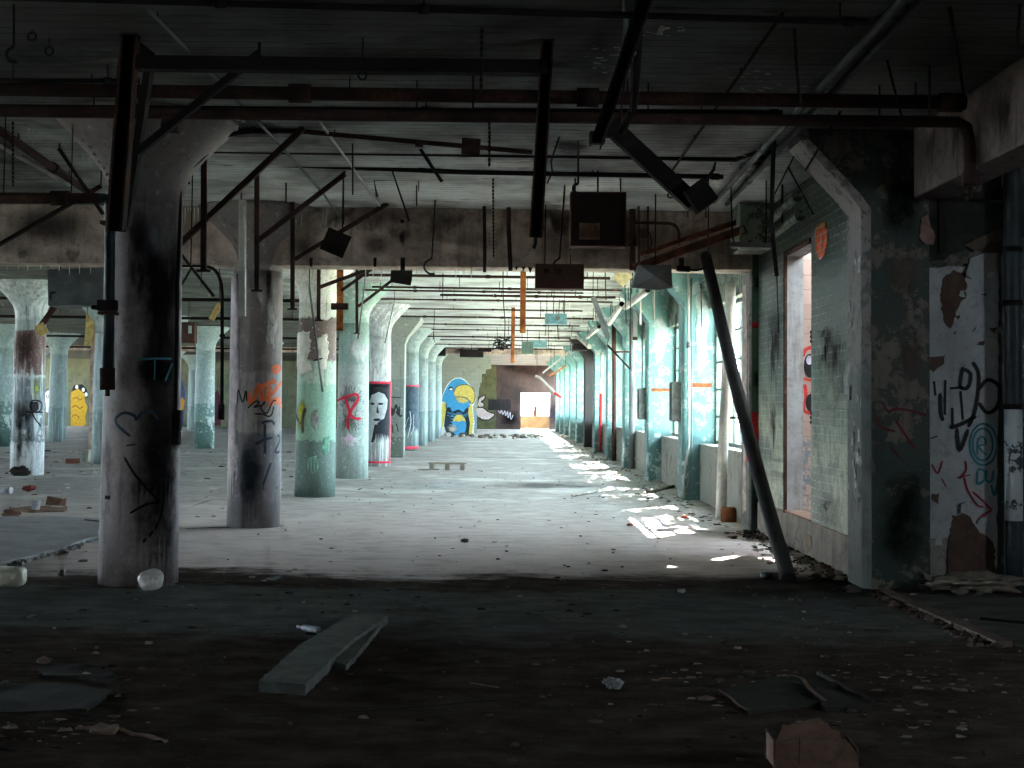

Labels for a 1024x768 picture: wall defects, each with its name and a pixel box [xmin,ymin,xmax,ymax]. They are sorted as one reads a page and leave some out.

peeling [919,214,935,245]
peeling [940,264,1002,346]
peeling [297,319,335,377]
peeling [653,316,670,377]
peeling [695,292,710,396]
peeling [930,502,996,575]